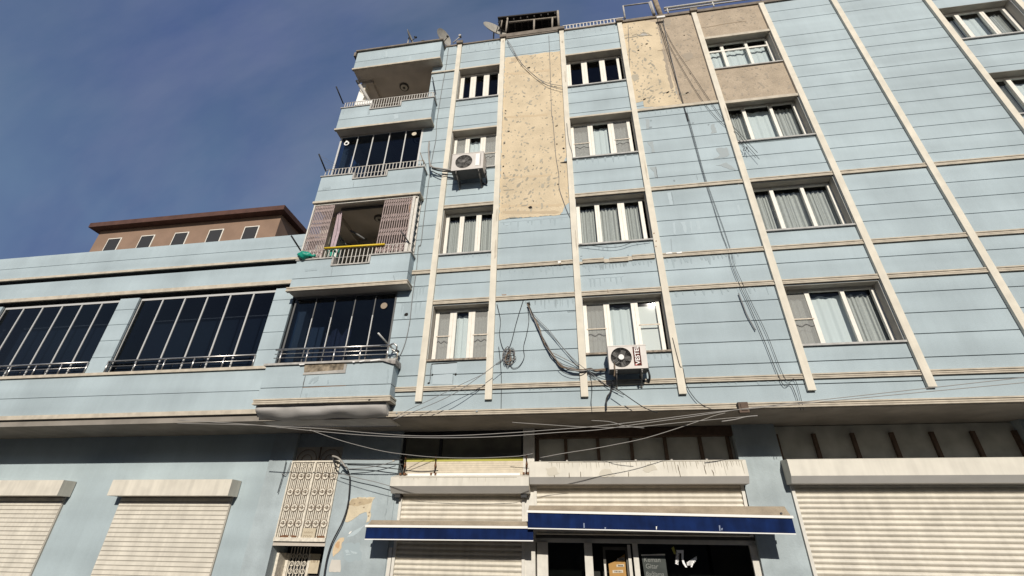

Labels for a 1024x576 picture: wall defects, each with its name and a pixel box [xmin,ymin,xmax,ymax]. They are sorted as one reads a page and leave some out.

peeling [329,497,375,572]